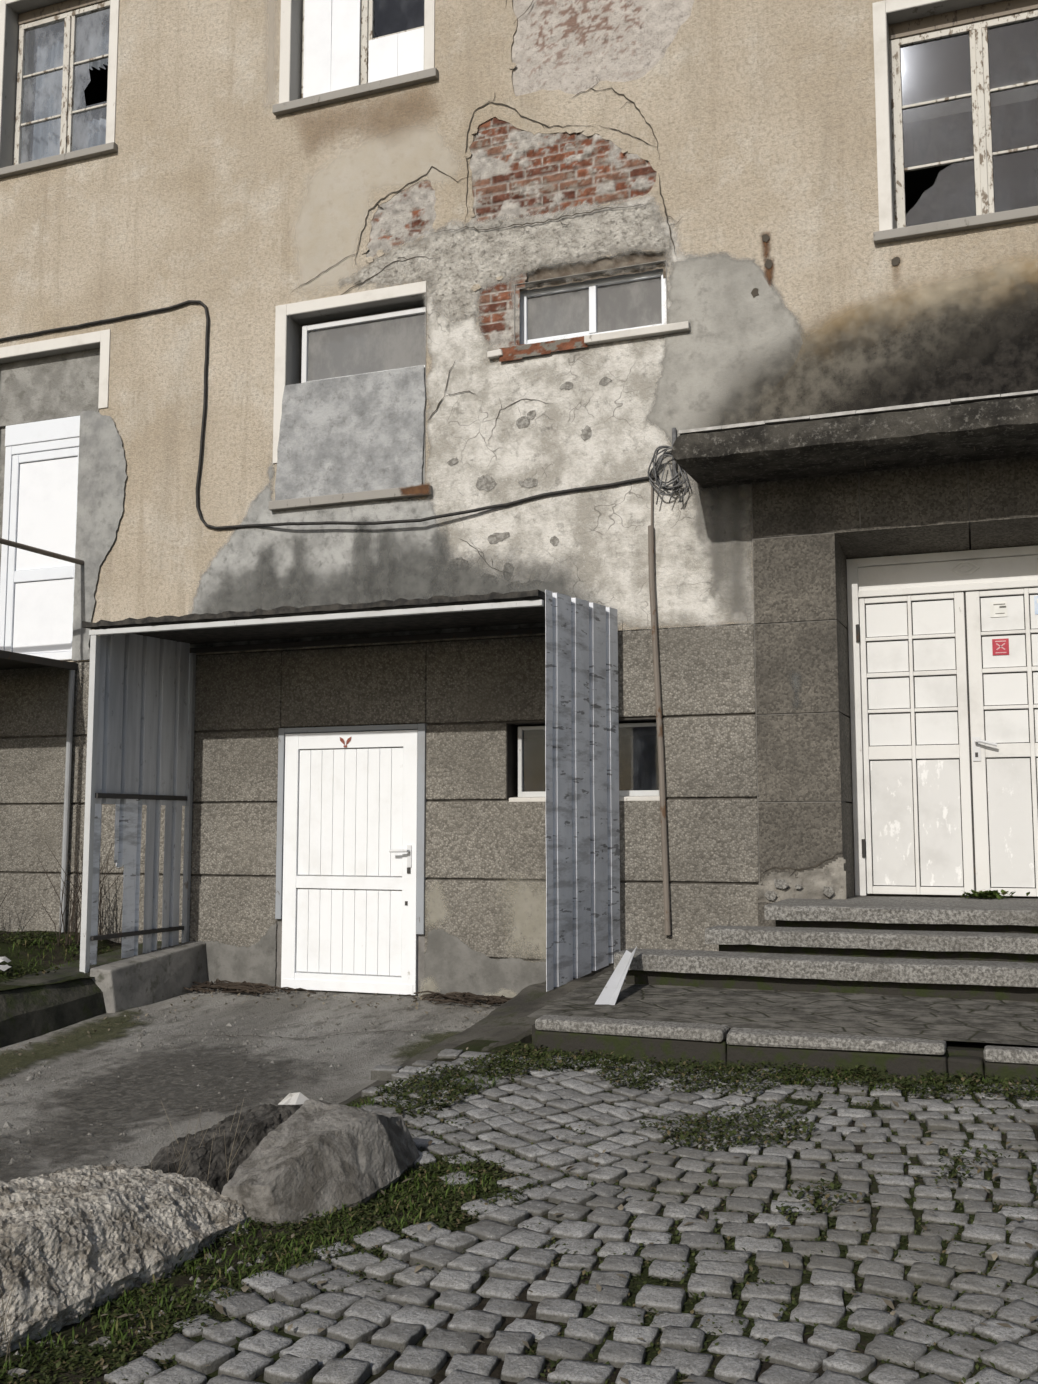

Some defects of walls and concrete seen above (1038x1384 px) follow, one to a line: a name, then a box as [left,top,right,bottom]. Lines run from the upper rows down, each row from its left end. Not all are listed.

flaking render [508,0,694,97]
crack [291,77,680,295]
peeling [297,118,754,628]
corrosion [751,233,773,298]
leakage [711,261,1038,433]
leakage [204,525,584,614]